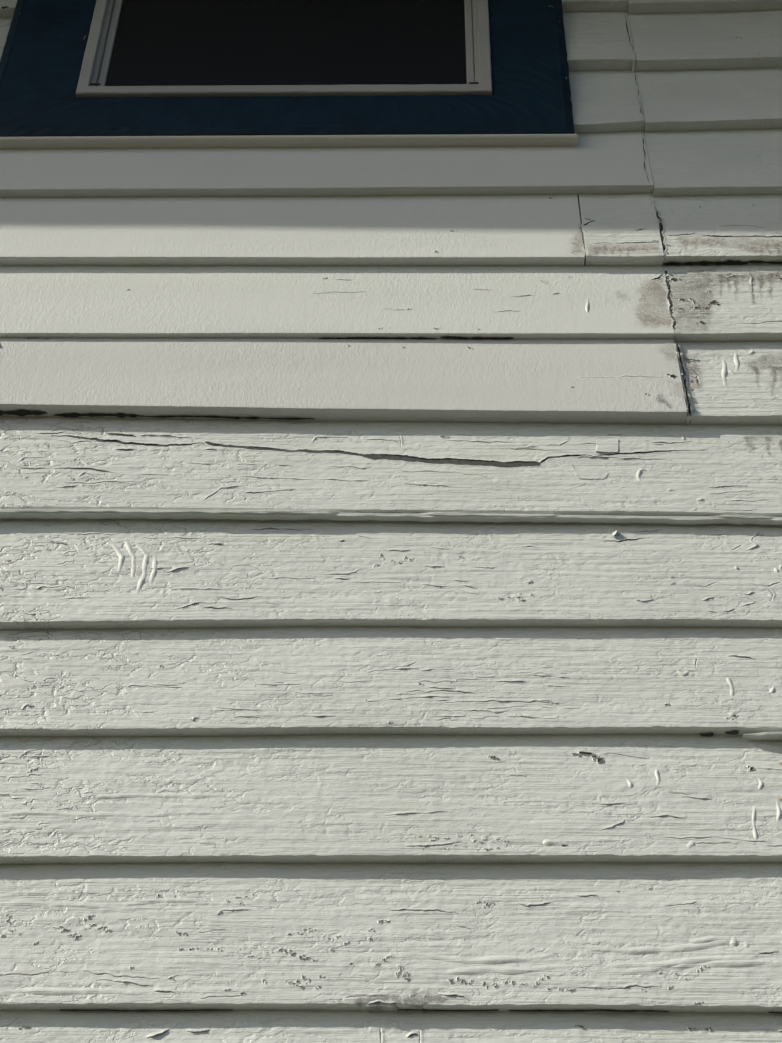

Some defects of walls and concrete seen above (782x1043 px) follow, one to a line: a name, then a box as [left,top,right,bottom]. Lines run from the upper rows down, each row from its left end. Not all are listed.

crack [0,12,782,502]
water stain [679,272,780,316]
peeling [596,439,618,453]
crack [0,531,496,616]
crack [189,661,581,722]
peeling [571,751,605,764]
crack [0,747,93,831]
crack [600,789,782,849]
peeling [51,914,113,941]
peeling [278,927,350,962]
peeling [284,974,326,990]
peeling [341,955,576,1010]